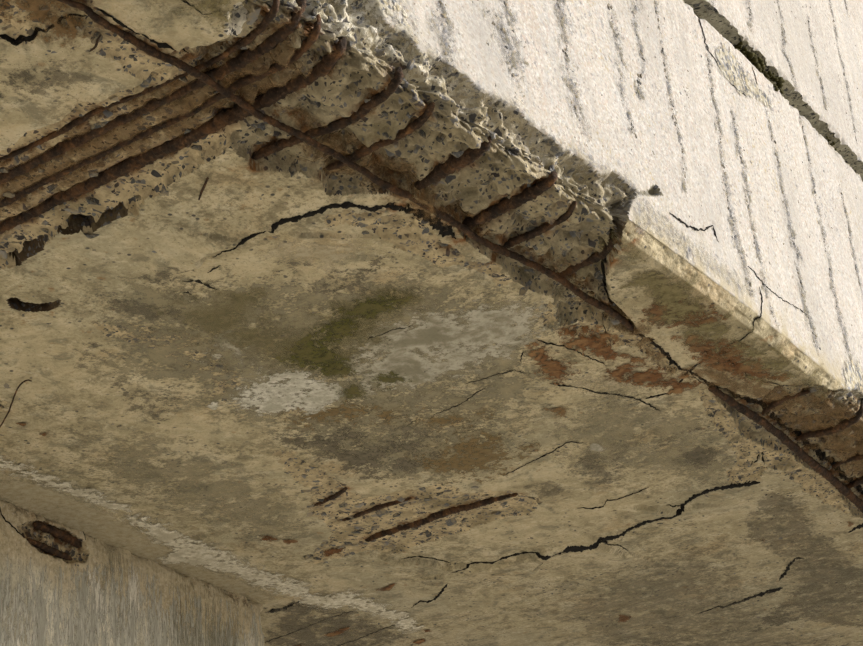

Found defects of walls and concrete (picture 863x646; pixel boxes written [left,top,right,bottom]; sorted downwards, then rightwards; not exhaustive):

corrosion [0,0,98,50]
corrosion [0,21,316,222]
crack [182,202,456,295]
damp [74,237,574,484]
spalling [0,0,679,375]
crack [669,212,717,238]
corrosion [524,298,863,482]
damp [595,229,828,401]
spalling [695,370,863,524]
spalling [17,520,89,566]
crack [404,452,765,608]
crack [695,557,803,615]